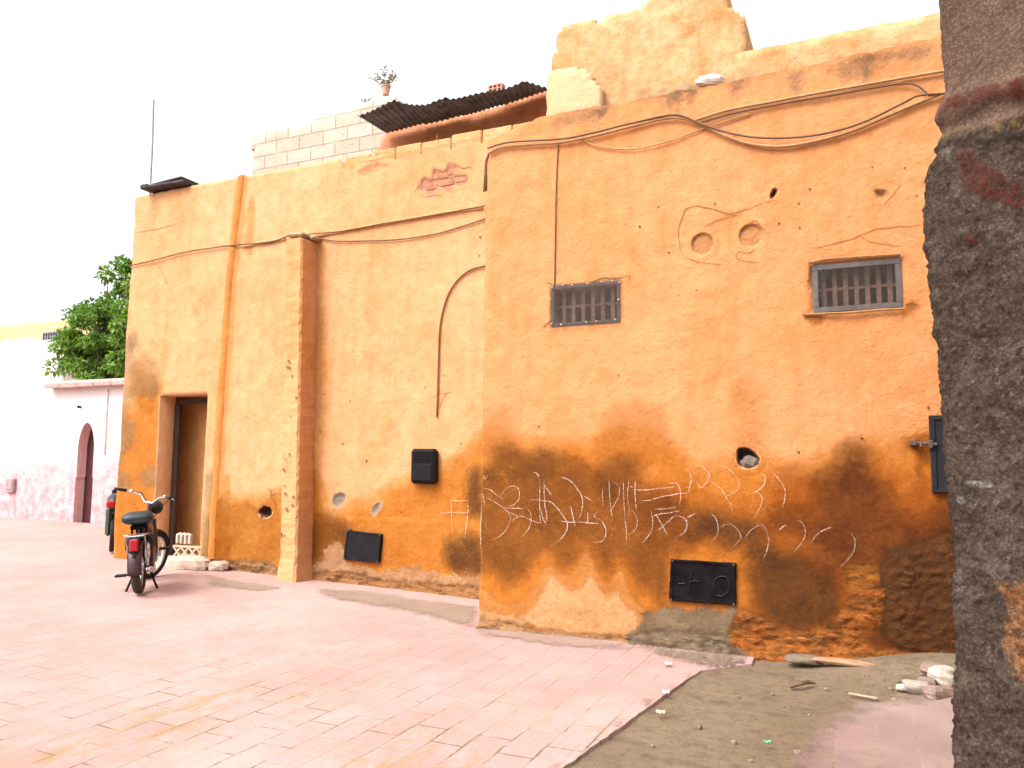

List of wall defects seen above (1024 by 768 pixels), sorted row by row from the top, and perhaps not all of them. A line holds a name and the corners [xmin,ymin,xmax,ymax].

flaking render [414,157,473,201]
damp [115,378,157,559]
flaking render [311,570,480,600]
damp [312,445,952,639]
flaking render [476,531,956,667]